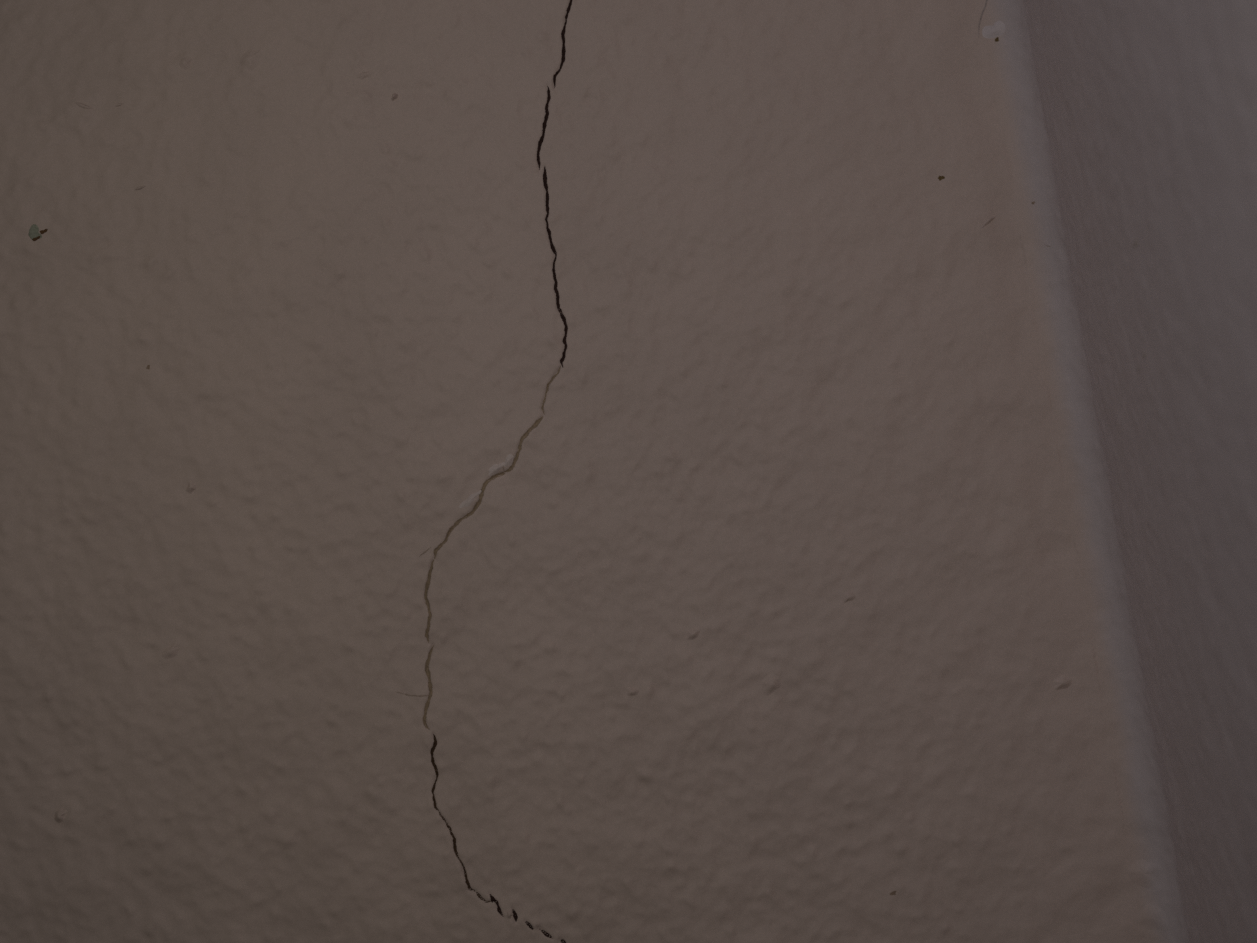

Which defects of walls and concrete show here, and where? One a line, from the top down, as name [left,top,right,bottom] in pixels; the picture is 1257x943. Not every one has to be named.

crack [395,0,572,943]